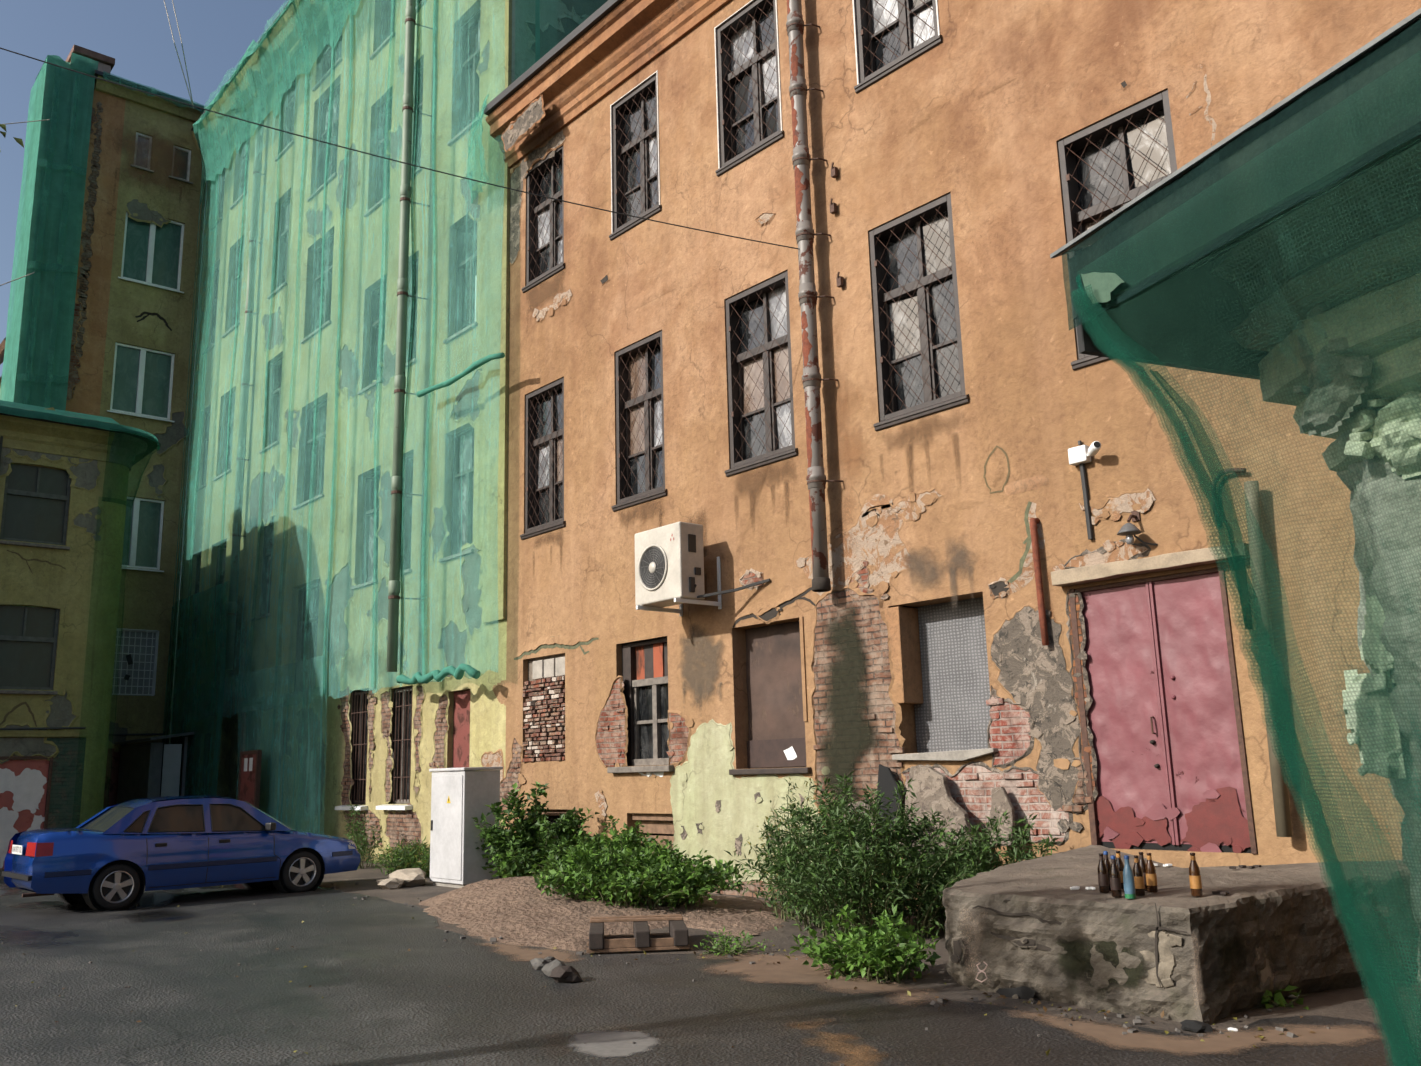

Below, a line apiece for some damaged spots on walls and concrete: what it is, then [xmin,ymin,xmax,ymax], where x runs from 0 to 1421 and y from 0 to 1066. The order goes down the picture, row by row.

corrosion [791,44,799,77]
flaking render [501,95,566,266]
corrosion [794,165,806,222]
corrosion [801,311,813,367]
peeling [65,458,104,493]
peeling [594,484,1251,855]
damp [821,609,879,806]
peeling [0,722,59,764]